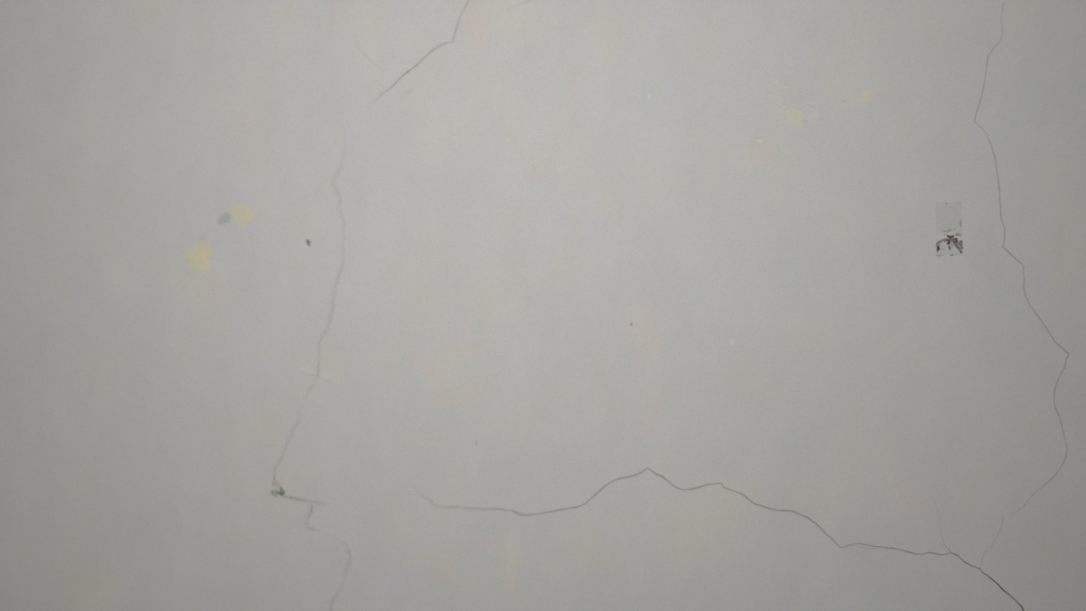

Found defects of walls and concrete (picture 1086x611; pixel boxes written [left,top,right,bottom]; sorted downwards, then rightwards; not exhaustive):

crack [411,0,1070,611]